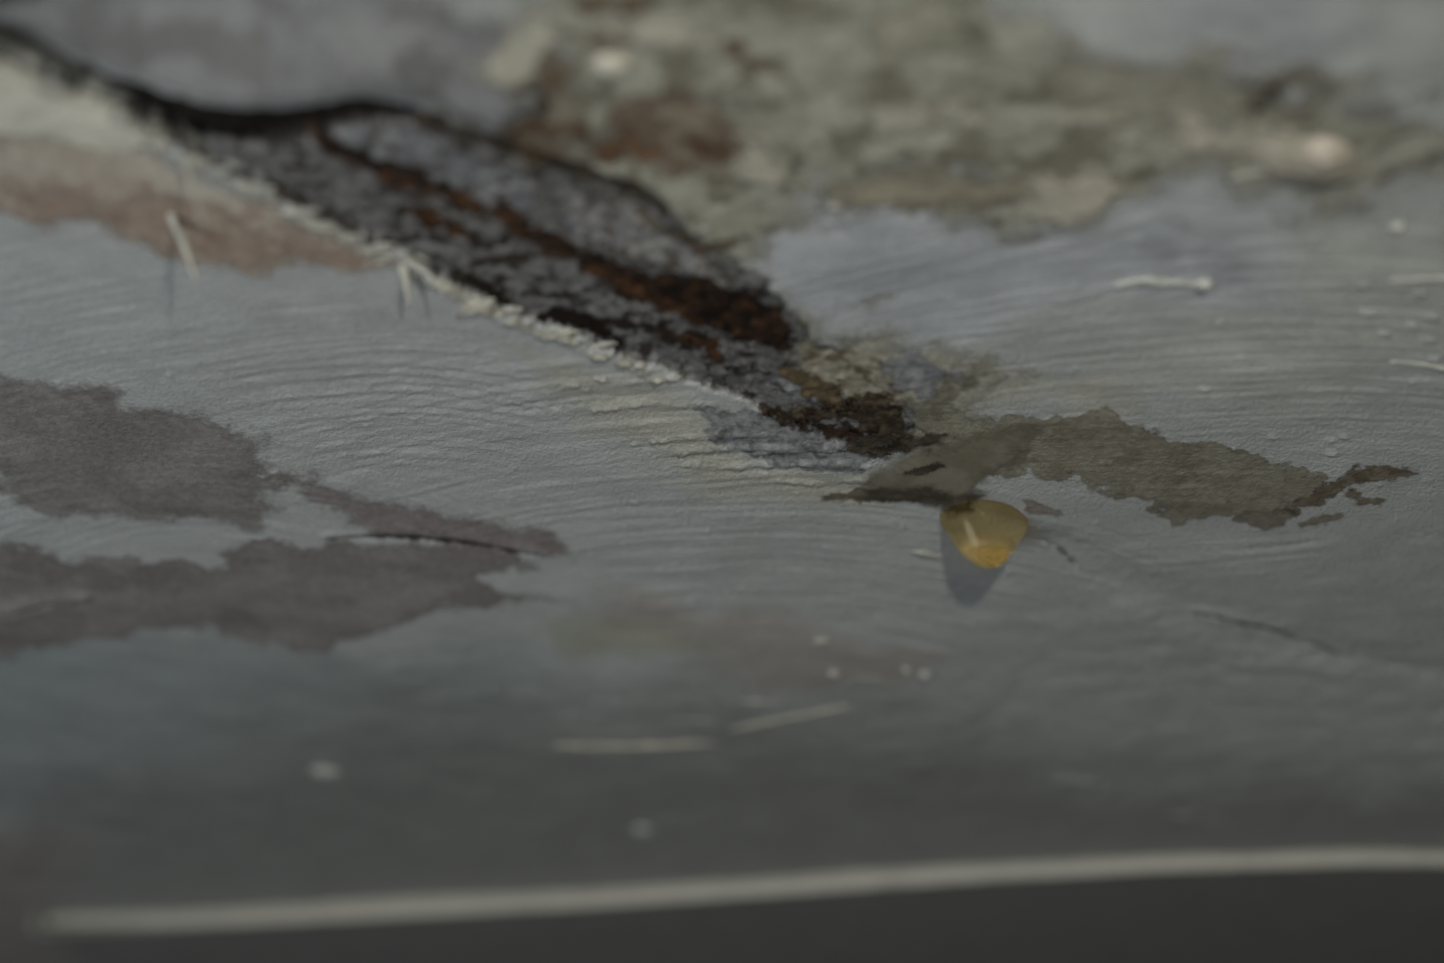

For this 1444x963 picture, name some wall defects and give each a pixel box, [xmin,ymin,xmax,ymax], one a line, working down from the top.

damp [0,50,396,275]
crack [0,21,750,257]
spalling [36,65,962,473]
corrosion [309,119,797,360]
damp [480,0,1444,287]
damp [0,376,564,661]
corrosion [758,367,915,455]
damp [739,305,1419,531]